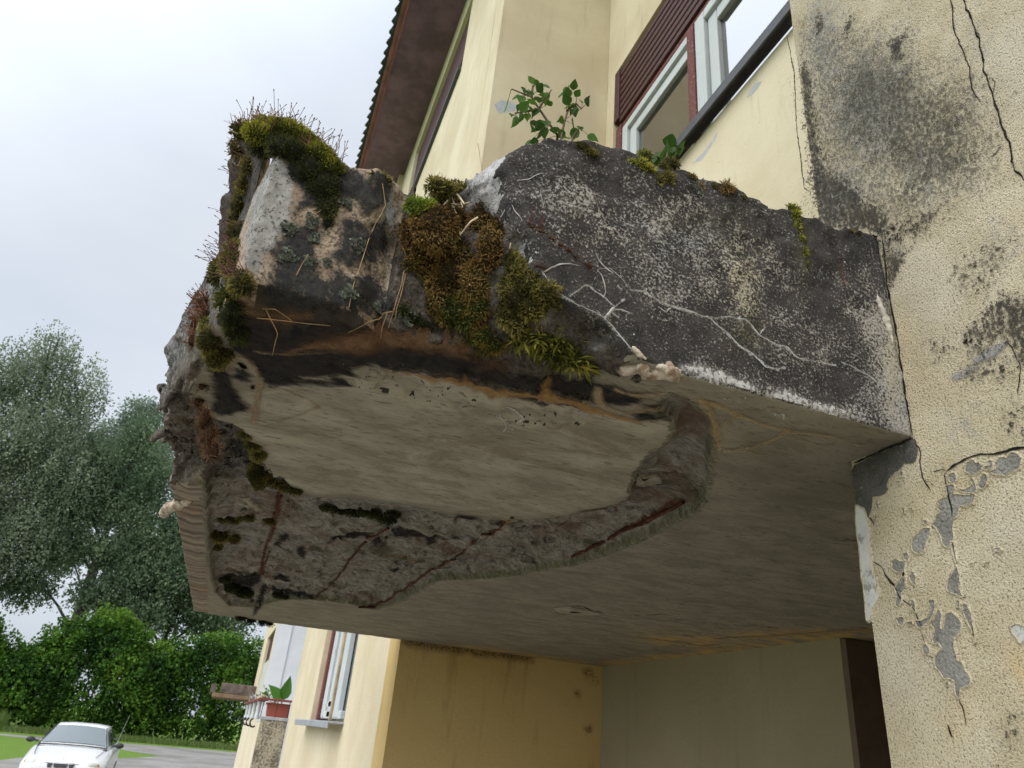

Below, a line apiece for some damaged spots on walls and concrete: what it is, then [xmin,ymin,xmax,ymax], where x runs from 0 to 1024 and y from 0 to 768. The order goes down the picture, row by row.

spalling [218,140,268,256]
crack [787,38,808,191]
leakage [787,0,1018,287]
crack [950,0,1024,180]
spalling [150,275,722,615]
spalling [381,155,630,413]
leakage [593,387,667,421]
leakage [618,346,755,399]
crack [543,254,884,383]
leakage [774,389,846,416]
crack [914,437,1024,513]
peeling [855,450,1024,700]